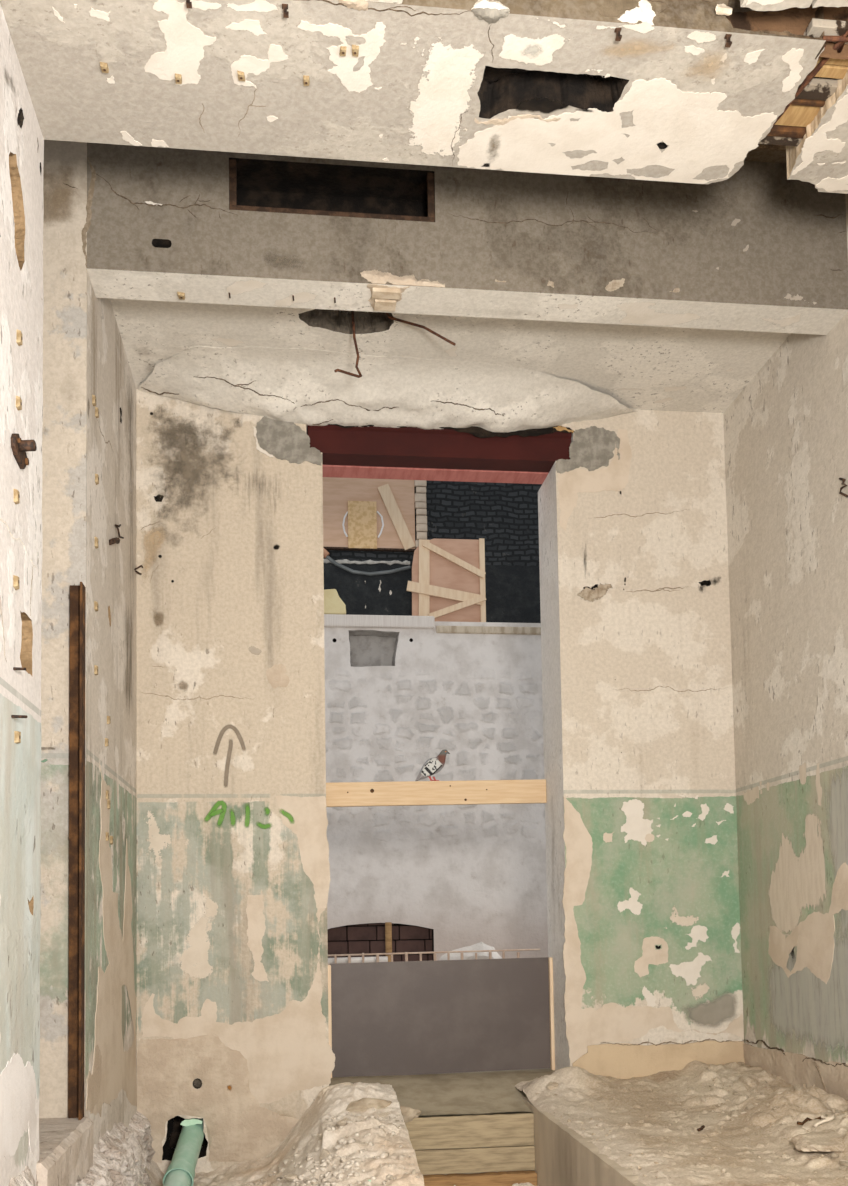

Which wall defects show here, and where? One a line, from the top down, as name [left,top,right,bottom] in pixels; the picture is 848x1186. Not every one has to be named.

peeling [144,0,289,89]
peeling [298,21,386,93]
crack [301,0,494,62]
peeling [400,0,848,192]
spalling [274,270,456,378]
water stain [159,415,228,516]
crack [596,509,687,518]
crack [626,585,683,593]
flaking render [75,763,335,1186]
peeling [562,762,848,1101]
crack [603,1039,848,1092]
peeling [0,1053,37,1186]